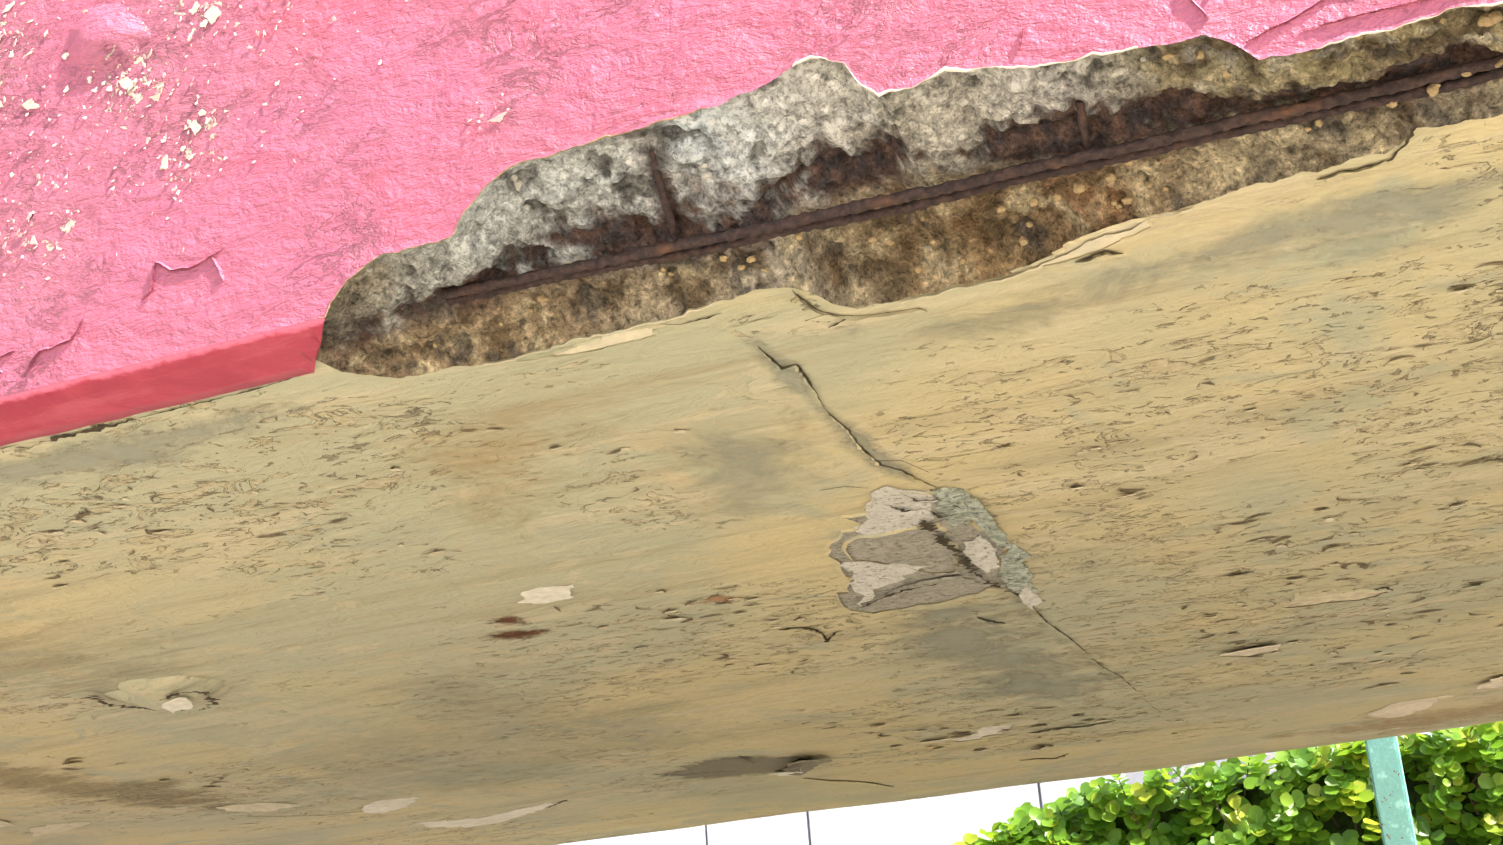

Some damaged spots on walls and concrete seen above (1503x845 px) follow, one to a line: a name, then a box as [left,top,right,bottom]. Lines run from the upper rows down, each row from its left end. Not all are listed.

spalling [316,2,1503,378]
crack [792,290,927,328]
crack [757,346,937,491]
peeling [1115,489,1145,500]
peeling [1397,445,1440,471]
peeling [1459,444,1503,467]
peeling [824,486,1042,614]
peeling [517,584,818,675]
crack [782,627,843,643]
crack [973,580,1159,761]
peeling [1181,489,1454,718]
peeling [1477,676,1503,689]